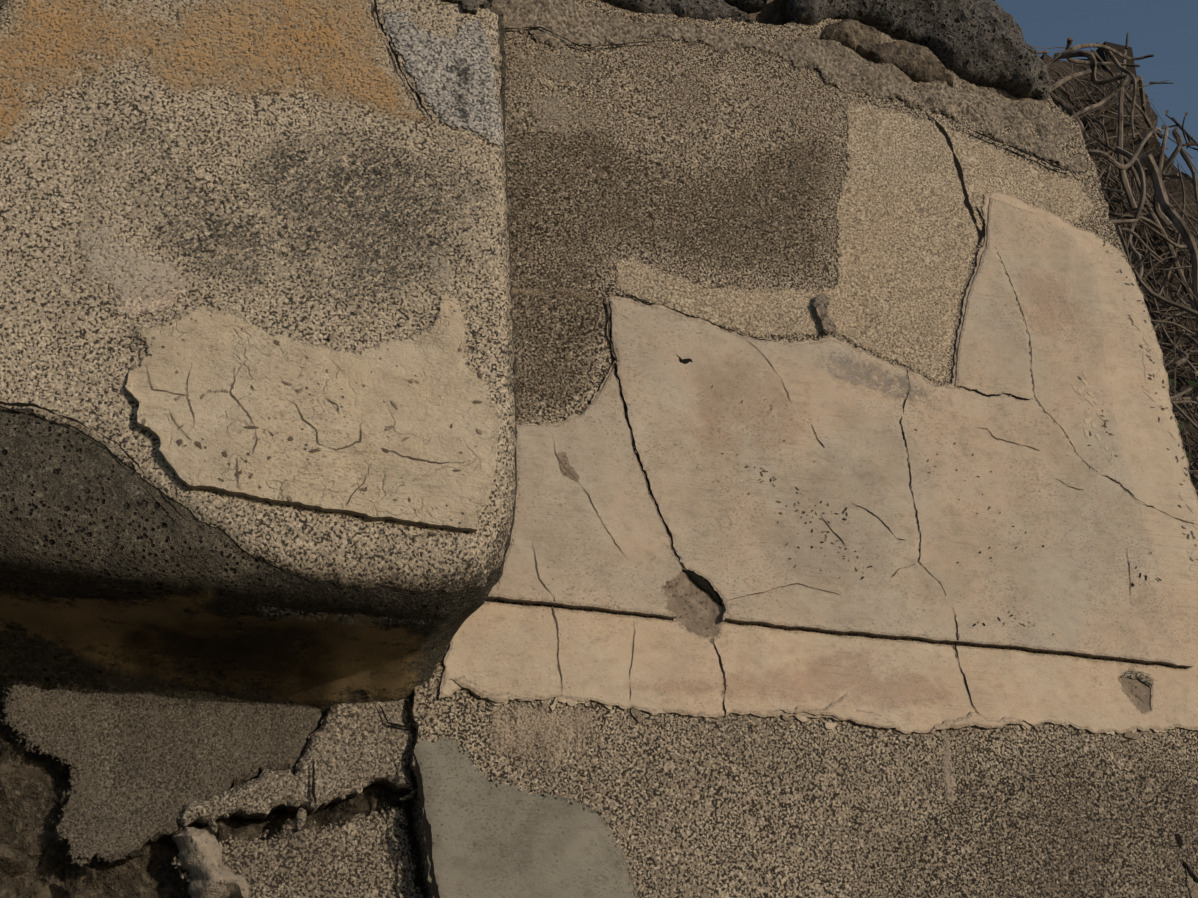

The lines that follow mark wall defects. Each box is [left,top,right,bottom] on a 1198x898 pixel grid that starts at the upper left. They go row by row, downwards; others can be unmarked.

damp [498,96,593,299]
crack [926,113,1195,524]
damp [1,678,322,869]
spalling [283,802,307,831]
damp [244,429,520,625]
crack [533,547,563,696]
spalling [663,570,724,637]
crack [605,294,792,571]
crack [711,638,727,716]
peeling [772,693,901,730]
crack [852,368,981,715]
spalling [1105,670,1174,740]